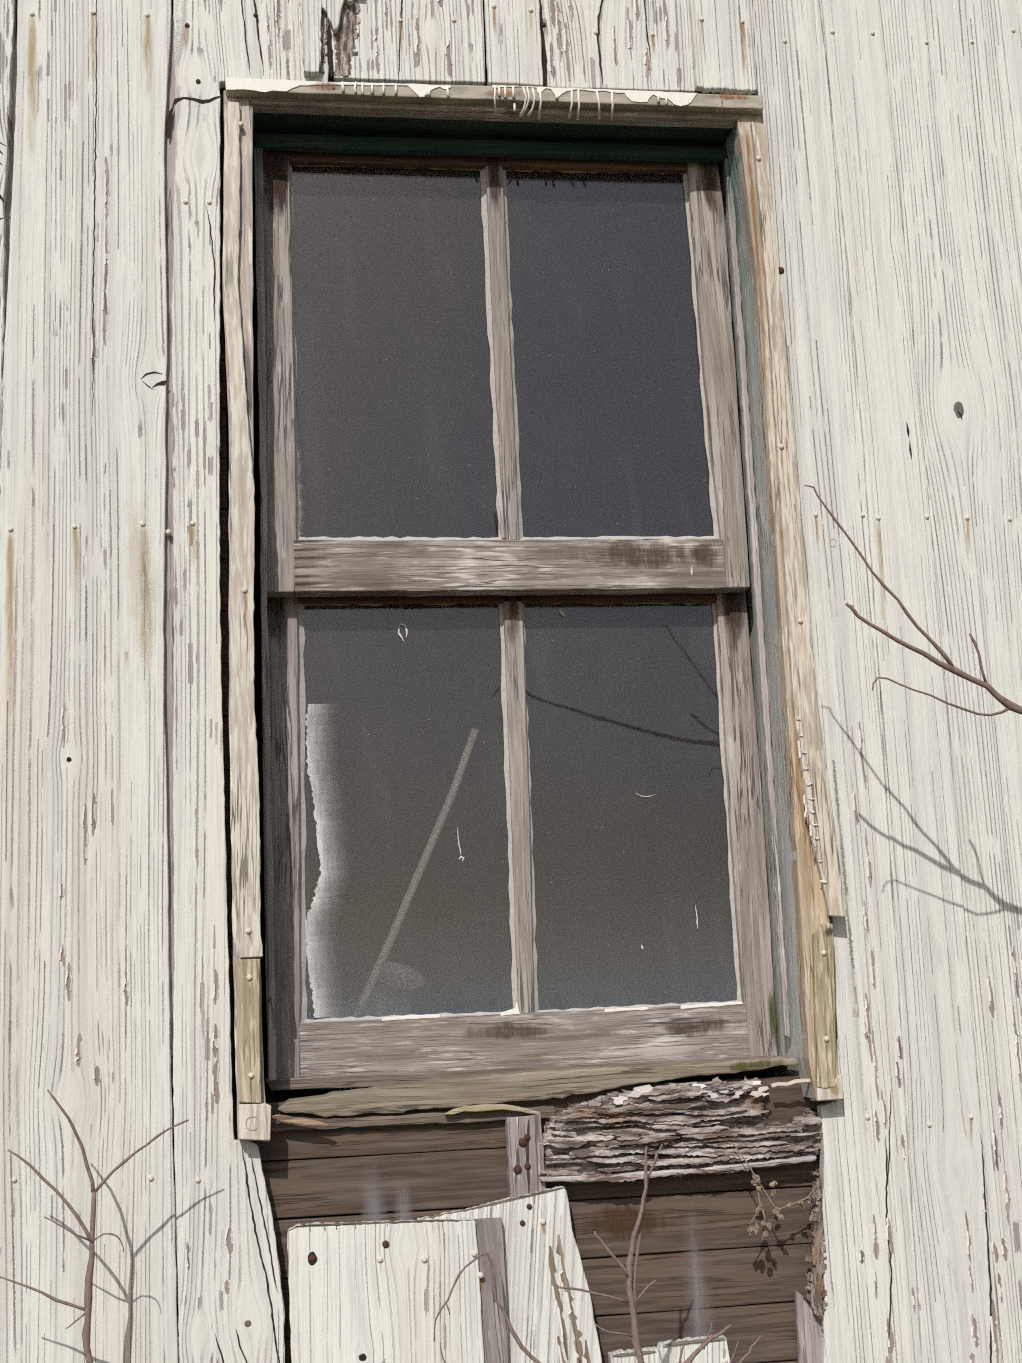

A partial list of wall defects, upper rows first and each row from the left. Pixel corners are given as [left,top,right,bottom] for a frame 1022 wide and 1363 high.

peeling [266,0,289,69]
crack [326,24,334,77]
peeling [549,0,574,81]
crack [596,0,604,84]
peeling [852,722,888,1142]
peeling [1011,946,1022,1083]
peeling [589,1085,653,1106]
peeling [678,1081,769,1098]
peeling [895,1036,903,1088]
peeling [859,1215,895,1299]
peeling [969,1090,1011,1363]
peeling [885,1318,895,1363]